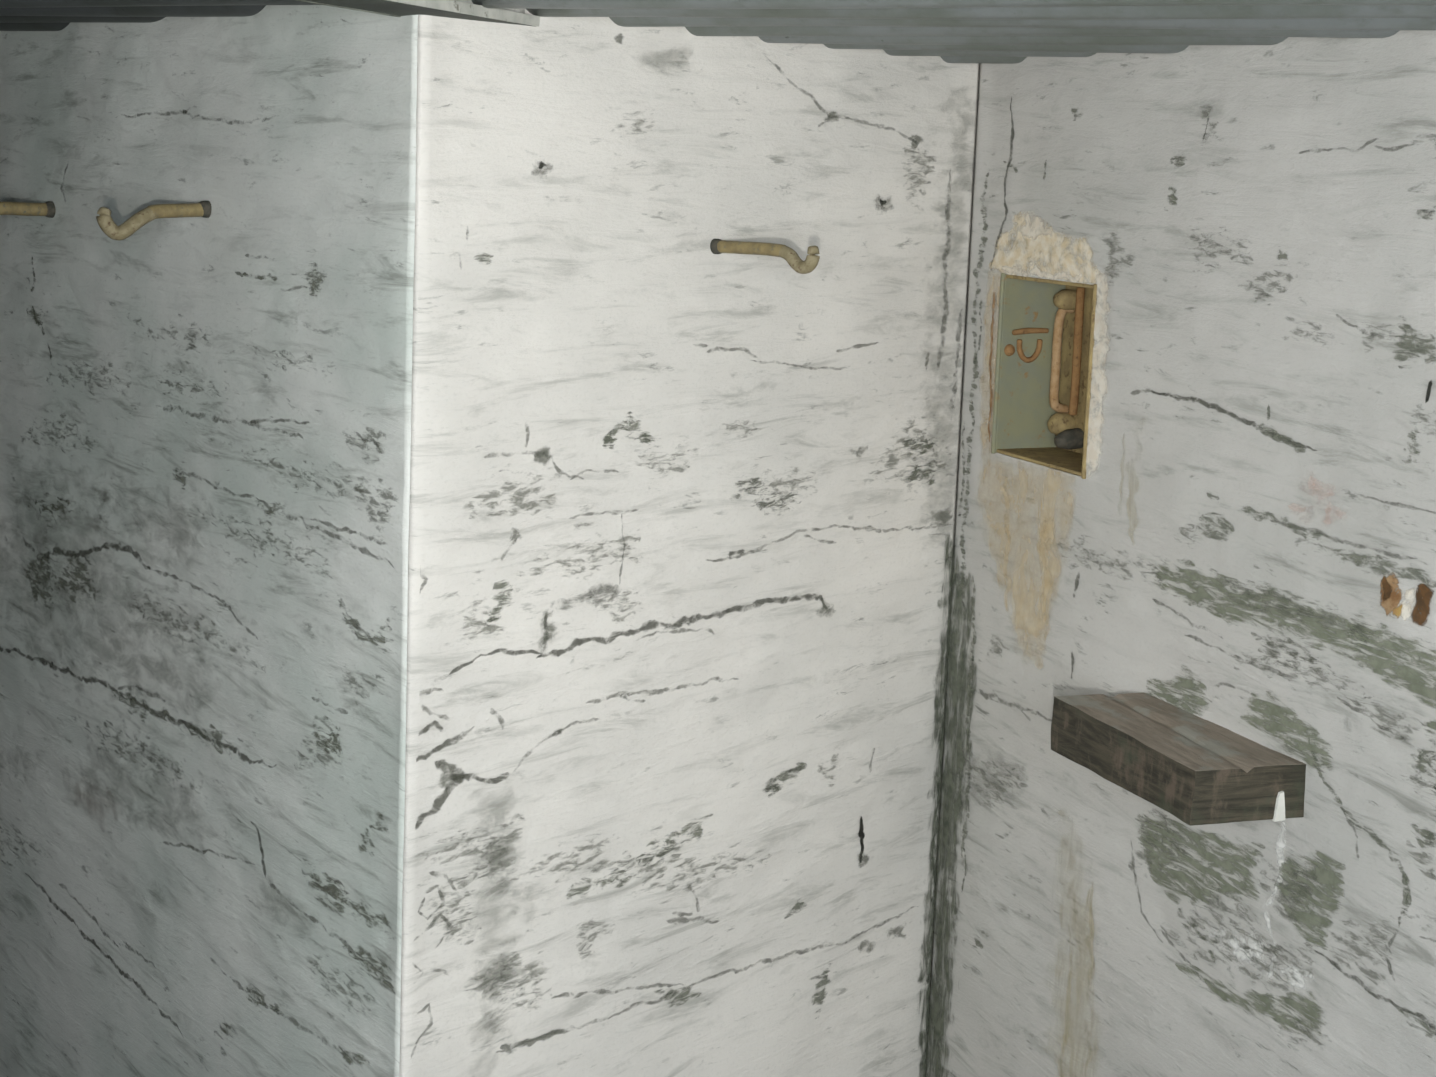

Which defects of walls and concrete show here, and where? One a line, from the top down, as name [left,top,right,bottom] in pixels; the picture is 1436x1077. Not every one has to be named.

crack [811,95,849,126]
crack [910,135,921,148]
damp [1002,266,1082,283]
crack [25,543,250,633]
crack [450,594,831,674]
damp [918,173,995,1077]
corrosion [1380,574,1434,626]
damp [1210,822,1312,987]